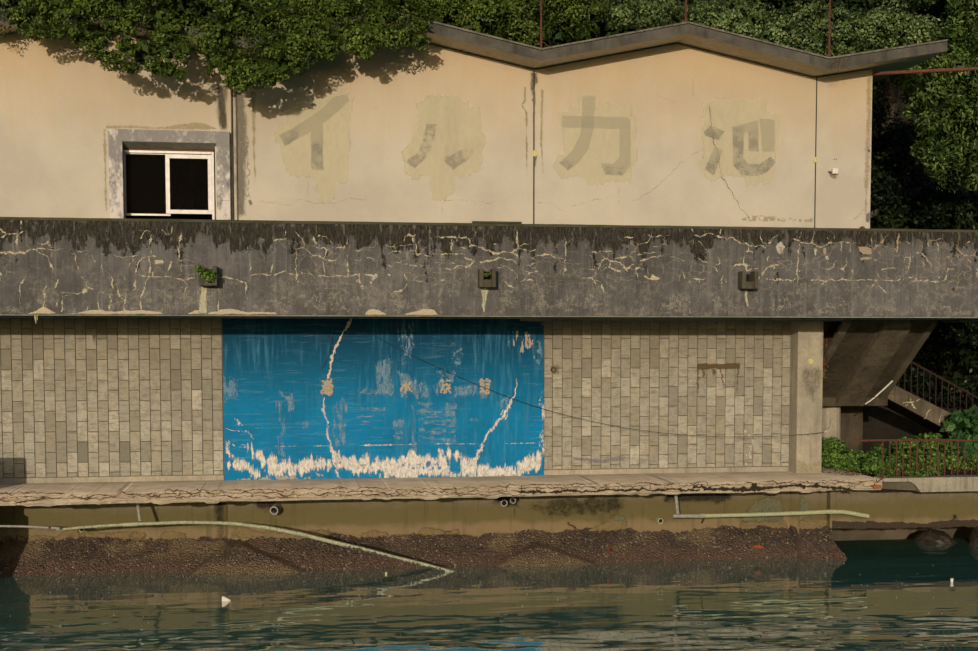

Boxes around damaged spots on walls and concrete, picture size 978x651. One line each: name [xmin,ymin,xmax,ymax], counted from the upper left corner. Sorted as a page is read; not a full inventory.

crack [0,221,195,312]
water stain [0,73,978,316]
crack [217,107,978,311]
spalling [858,247,872,260]
peeling [226,320,547,480]